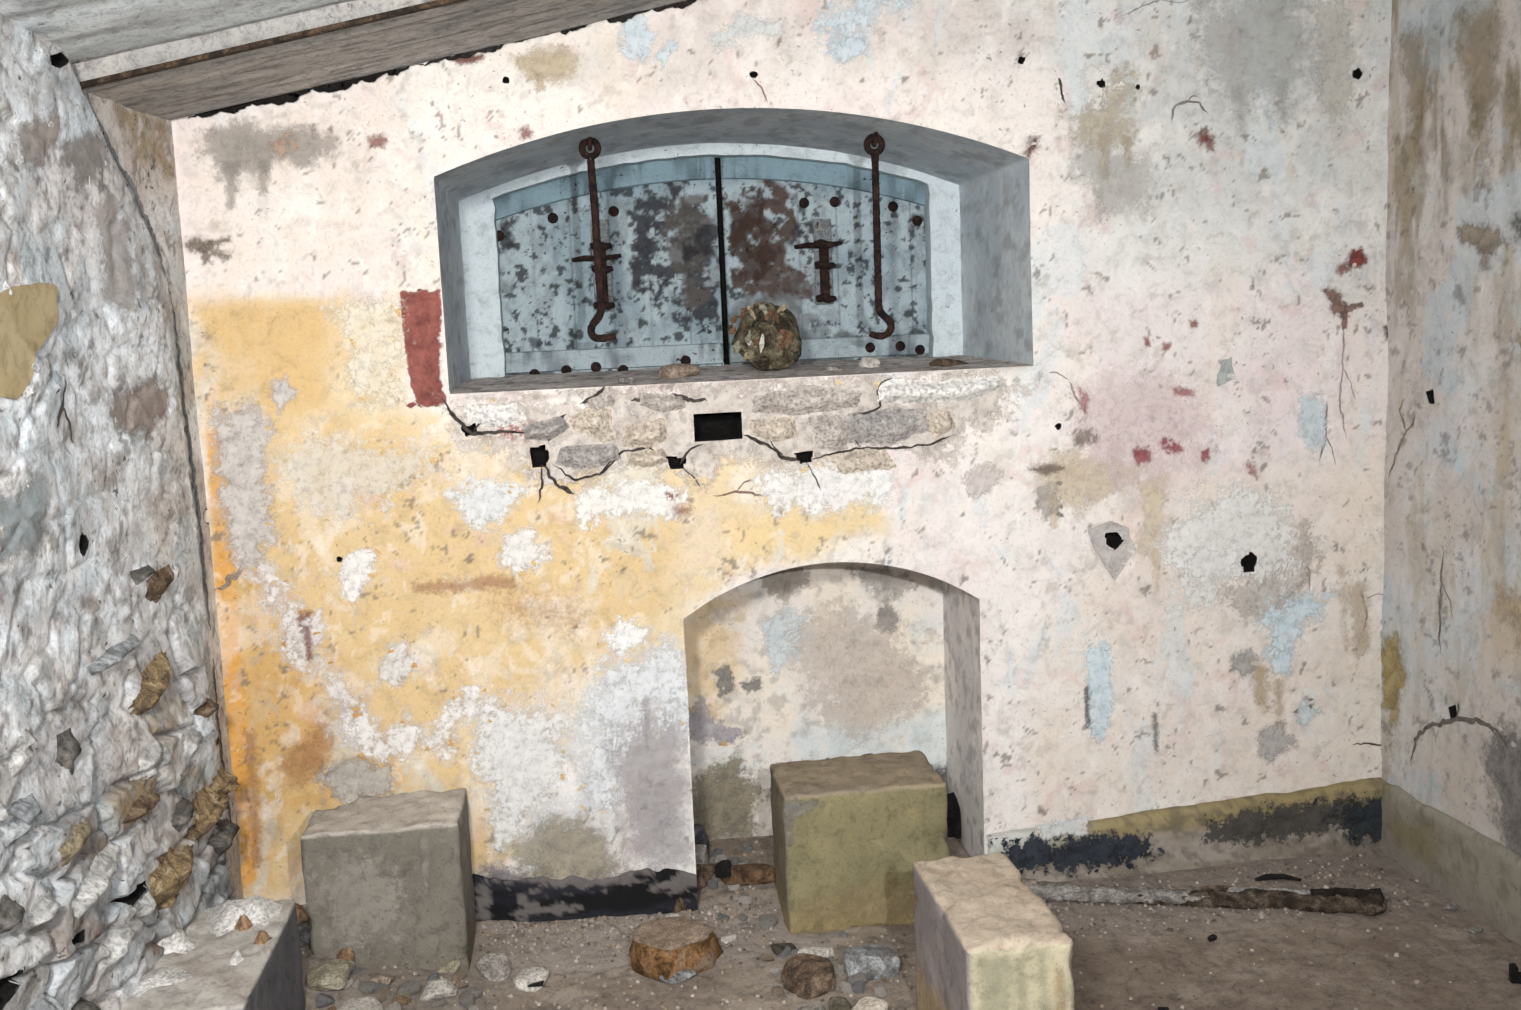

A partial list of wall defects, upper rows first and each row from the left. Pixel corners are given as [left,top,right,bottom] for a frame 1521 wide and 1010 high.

crack [441,378,957,503]
flaking render [203,289,1030,862]
flaking render [1088,521,1136,580]
crack [1354,704,1509,762]
spalling [109,879,147,907]
spalling [72,929,85,945]
spalling [0,966,26,1010]